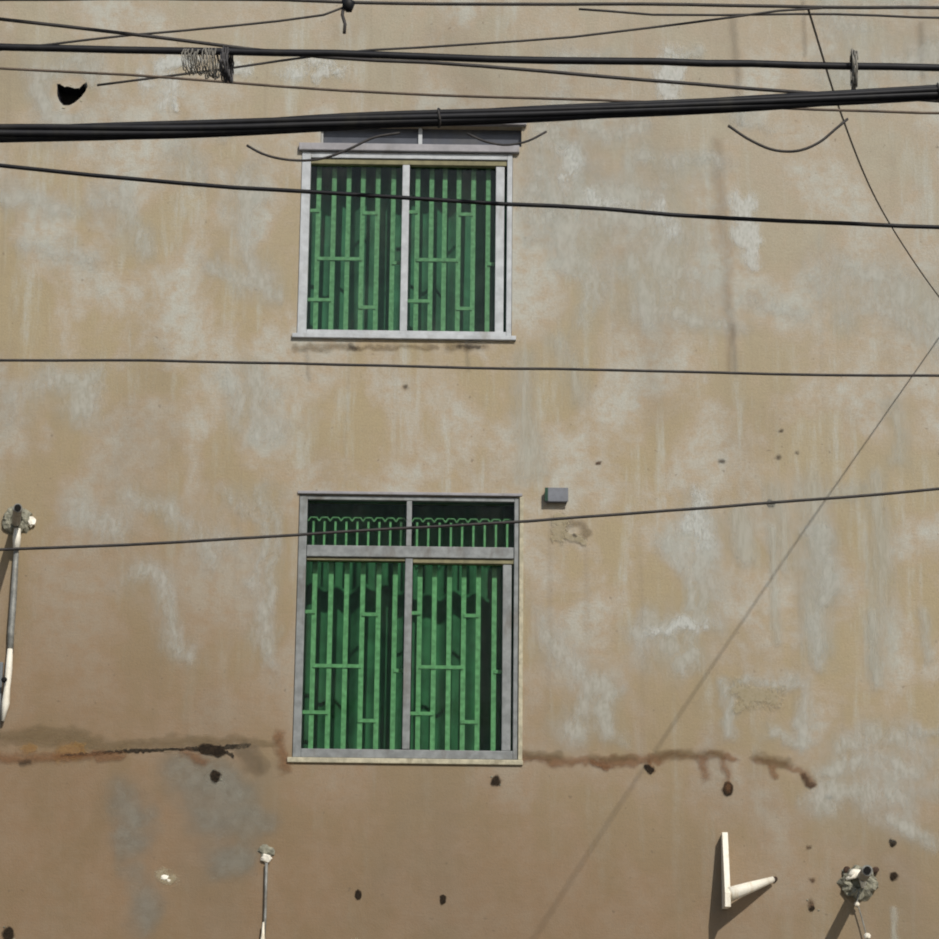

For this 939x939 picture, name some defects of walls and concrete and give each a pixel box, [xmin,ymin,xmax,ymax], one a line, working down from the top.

peeling [34,54,95,124]
corrosion [199,744,225,757]
corrosion [722,781,733,796]